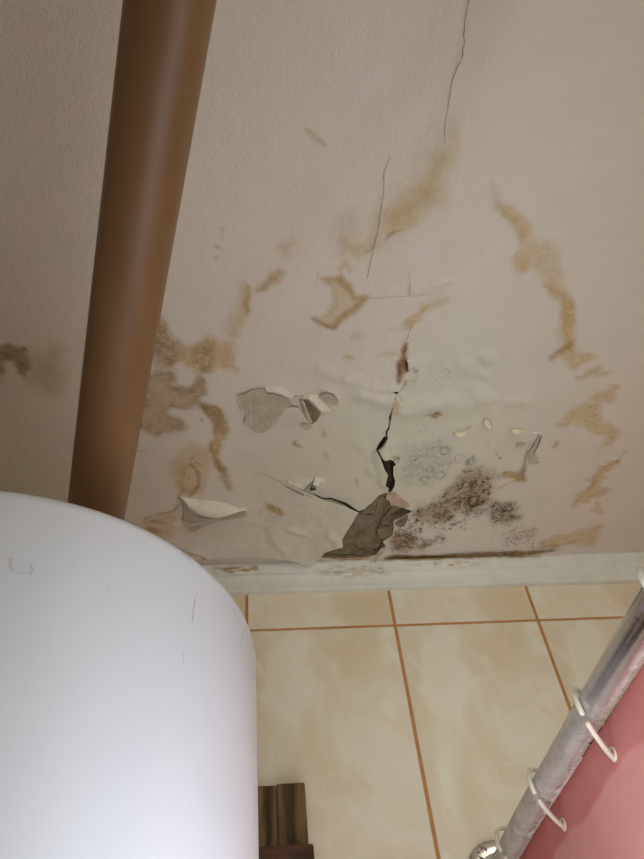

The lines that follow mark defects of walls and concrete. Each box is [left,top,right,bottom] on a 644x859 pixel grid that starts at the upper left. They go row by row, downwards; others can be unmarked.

crack [444,1,469,144]
peeling [237,386,341,434]
crack [376,392,403,492]
peeling [179,439,412,567]
crack [257,473,362,512]
water stain [386,460,553,560]